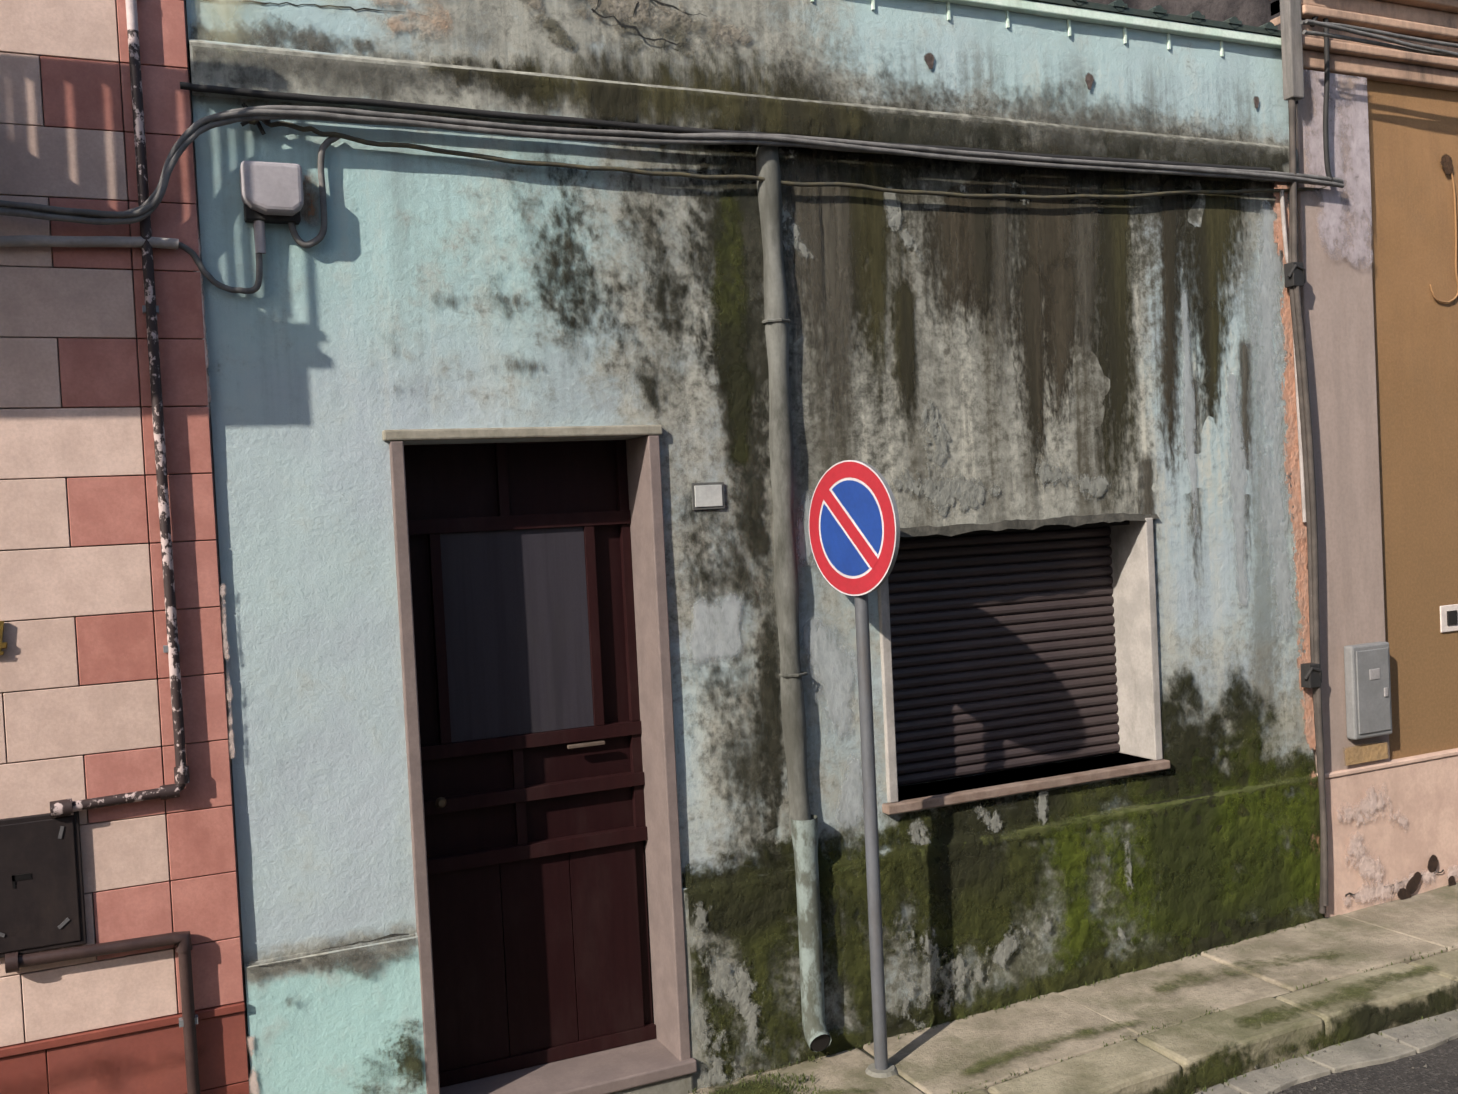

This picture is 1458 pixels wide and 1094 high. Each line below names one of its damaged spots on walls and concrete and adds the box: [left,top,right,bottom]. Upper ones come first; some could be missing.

flaking render [525,0,575,49]
crack [591,0,706,45]
flaking render [575,0,752,55]
leakage [534,151,629,348]
leakage [624,101,1289,871]
leakage [363,1022,424,1094]